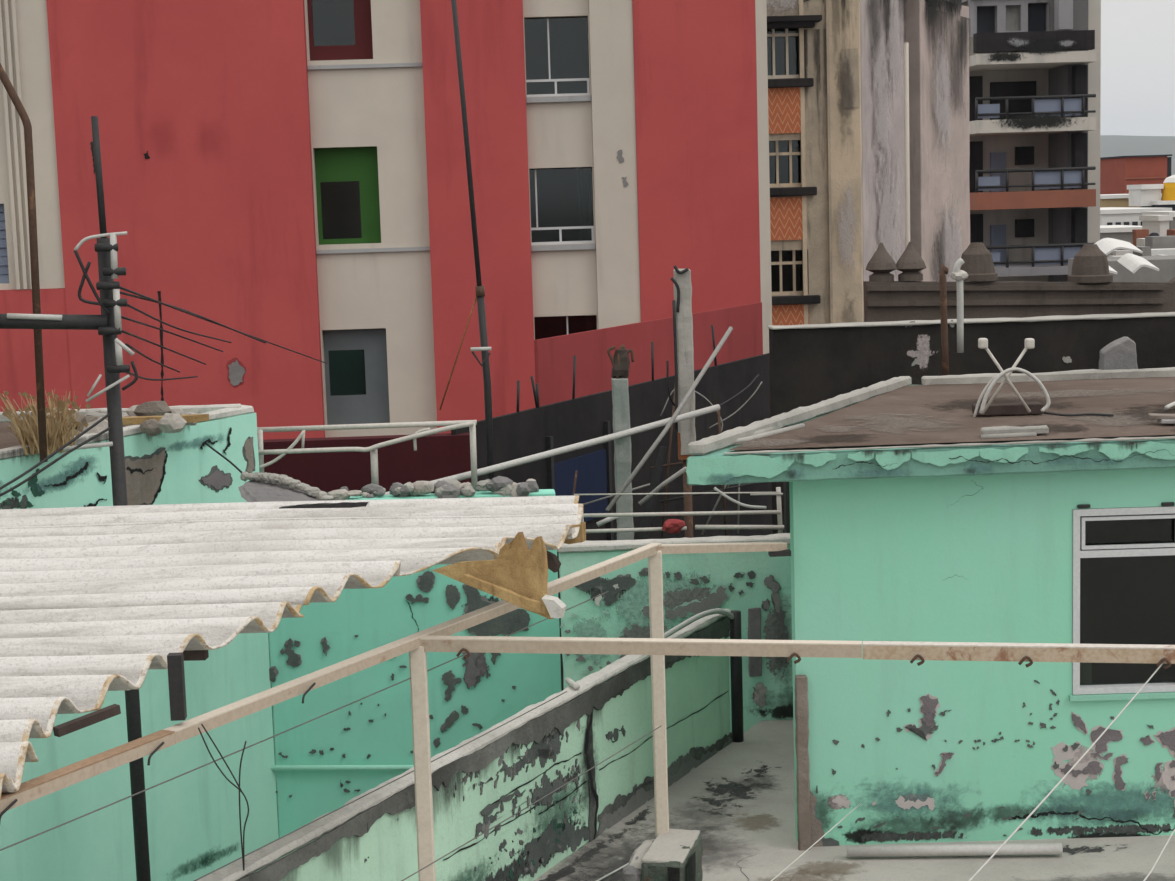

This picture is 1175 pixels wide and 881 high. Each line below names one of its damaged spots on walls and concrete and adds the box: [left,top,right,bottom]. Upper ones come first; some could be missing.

water stain [928,0,962,144]
water stain [874,0,902,281]
water stain [938,211,962,282]
spalling [125,447,168,505]
peeling [686,441,1175,485]
spalling [405,571,530,636]
peeling [560,568,789,640]
peeling [429,652,651,880]
crack [443,691,728,861]
peeling [236,784,416,881]
water stain [815,786,980,844]
water stain [995,788,1175,855]